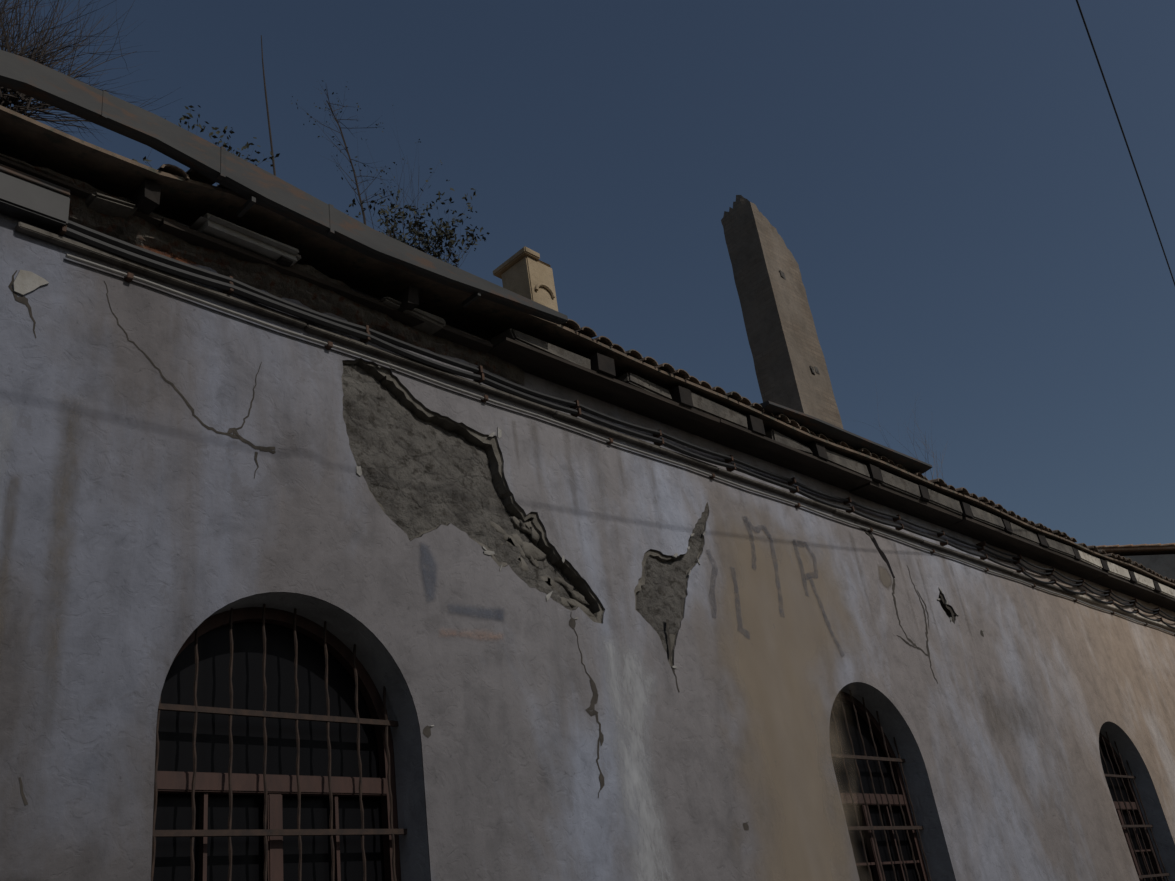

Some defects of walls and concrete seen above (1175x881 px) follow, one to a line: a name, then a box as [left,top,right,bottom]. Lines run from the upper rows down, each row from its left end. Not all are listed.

peeling [12,270,49,303]
crack [104,281,276,479]
spalling [341,359,604,629]
spalling [634,503,709,670]
crack [570,612,604,798]